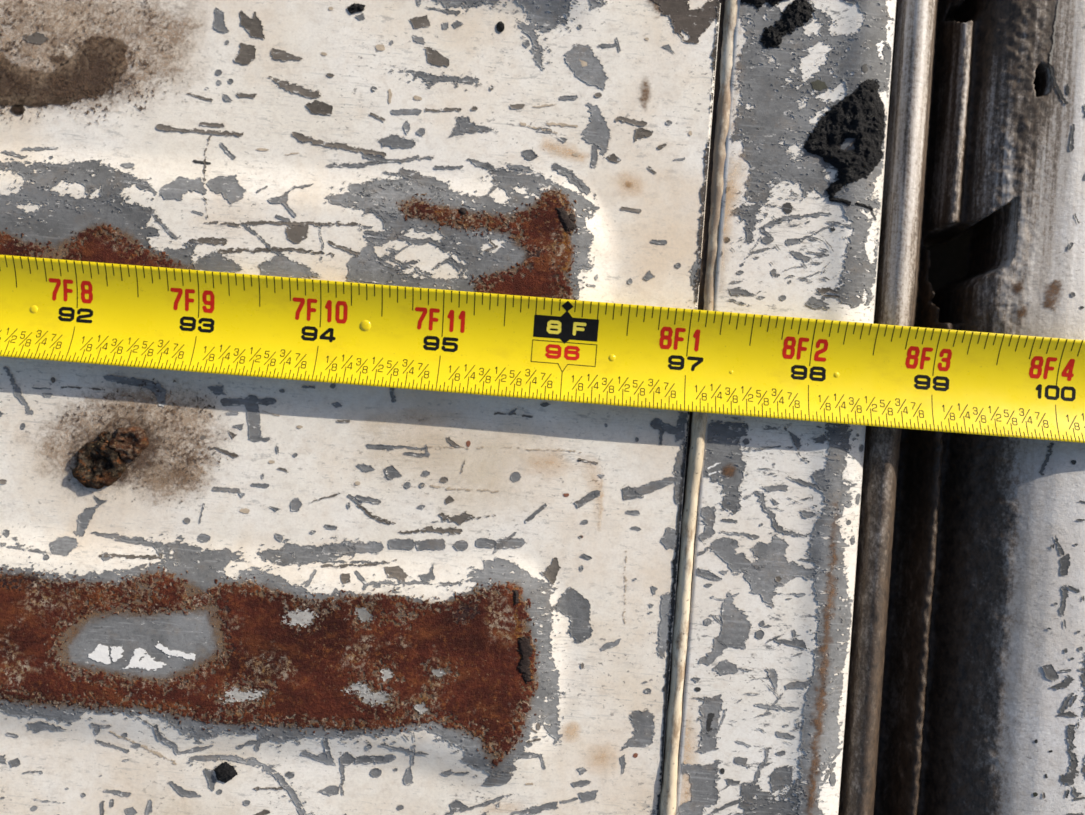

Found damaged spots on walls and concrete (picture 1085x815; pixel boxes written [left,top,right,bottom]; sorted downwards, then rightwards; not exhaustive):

peeling [649,0,721,54]
peeling [0,0,539,285]
peeling [510,37,667,168]
peeling [721,0,894,310]
corrosion [0,223,191,270]
corrosion [353,165,599,300]
peeling [0,495,163,561]
peeling [255,463,526,593]
corrosion [0,533,566,777]
peeling [543,557,593,643]
peeling [679,420,864,815]
peeling [301,732,429,796]